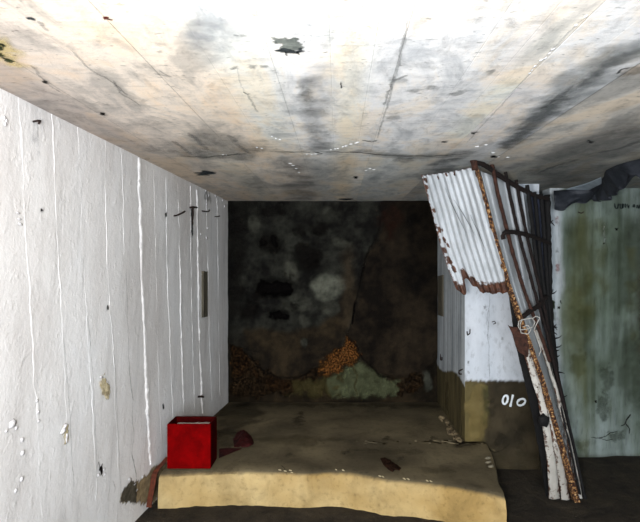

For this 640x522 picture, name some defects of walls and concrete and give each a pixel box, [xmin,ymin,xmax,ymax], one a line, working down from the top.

spalling [100,373,110,399]
peeling [120,462,167,505]